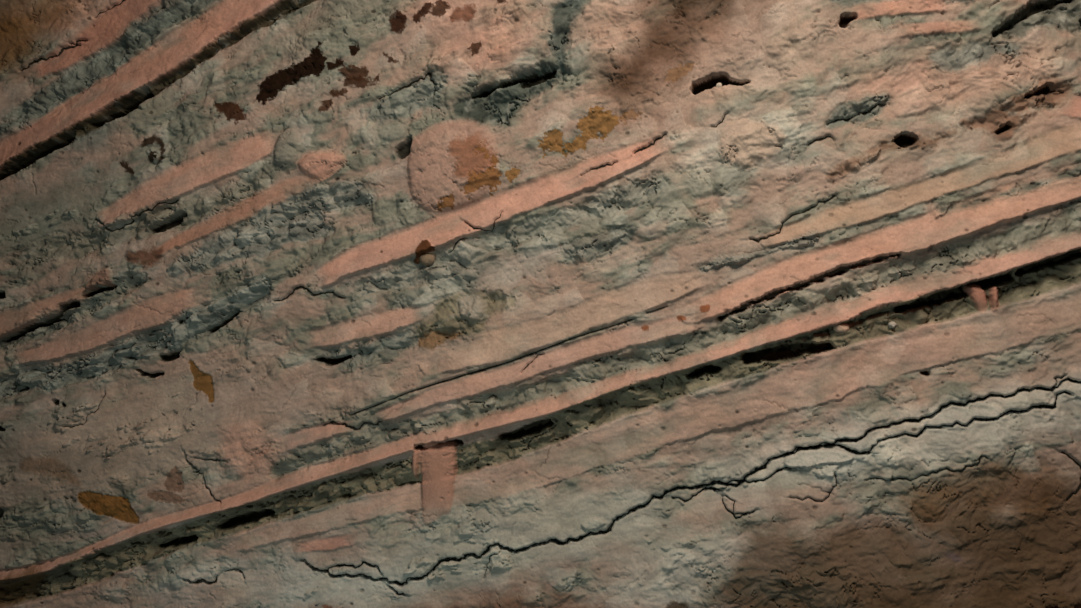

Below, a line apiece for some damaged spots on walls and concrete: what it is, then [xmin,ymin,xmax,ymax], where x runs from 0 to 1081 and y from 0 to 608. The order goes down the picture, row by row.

spalling [0,0,318,180]
spalling [3,169,378,279]
rust [447,130,498,181]
spalling [352,171,670,298]
peeling [537,106,643,159]
damp [584,0,784,114]
spalling [824,75,1075,184]
spalling [935,162,1081,217]
crack [325,307,665,429]
spalling [0,206,1081,604]
crack [304,375,1081,595]
damp [665,452,1081,608]